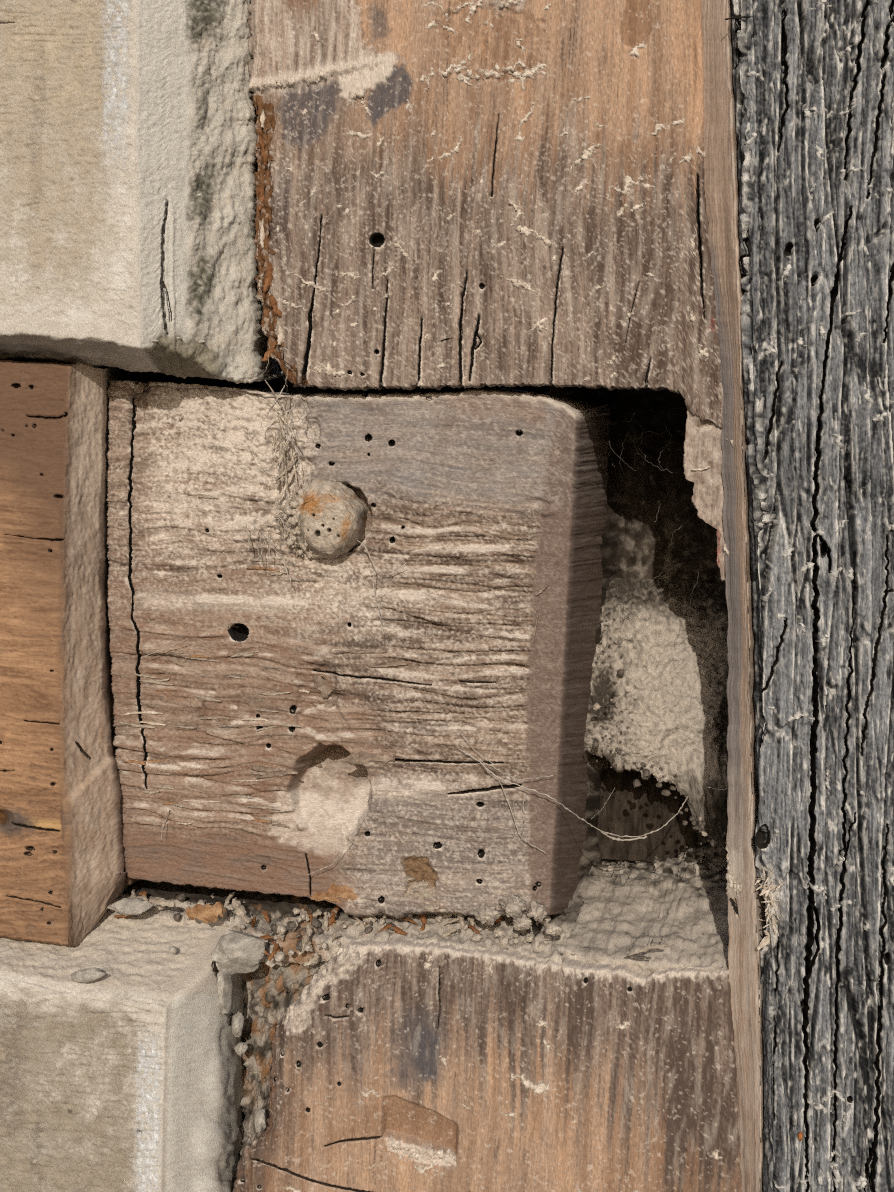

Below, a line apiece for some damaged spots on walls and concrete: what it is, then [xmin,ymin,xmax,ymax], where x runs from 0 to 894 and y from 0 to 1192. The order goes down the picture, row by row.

crack [128,398,148,789]
water stain [0,1003,161,1192]
crack [250,1158,371,1192]
crack [324,1134,383,1147]